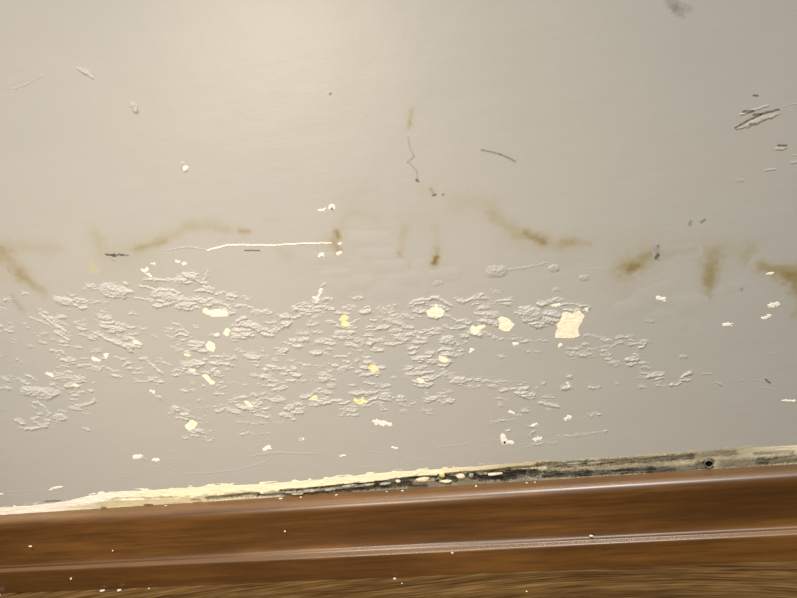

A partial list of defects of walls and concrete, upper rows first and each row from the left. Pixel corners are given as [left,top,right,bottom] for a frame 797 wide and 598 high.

spalling [734,94,797,129]
leakage [0,210,286,315]
leakage [312,177,797,326]
peeling [0,260,724,448]
flaking render [0,459,555,515]
flaking render [663,445,797,469]